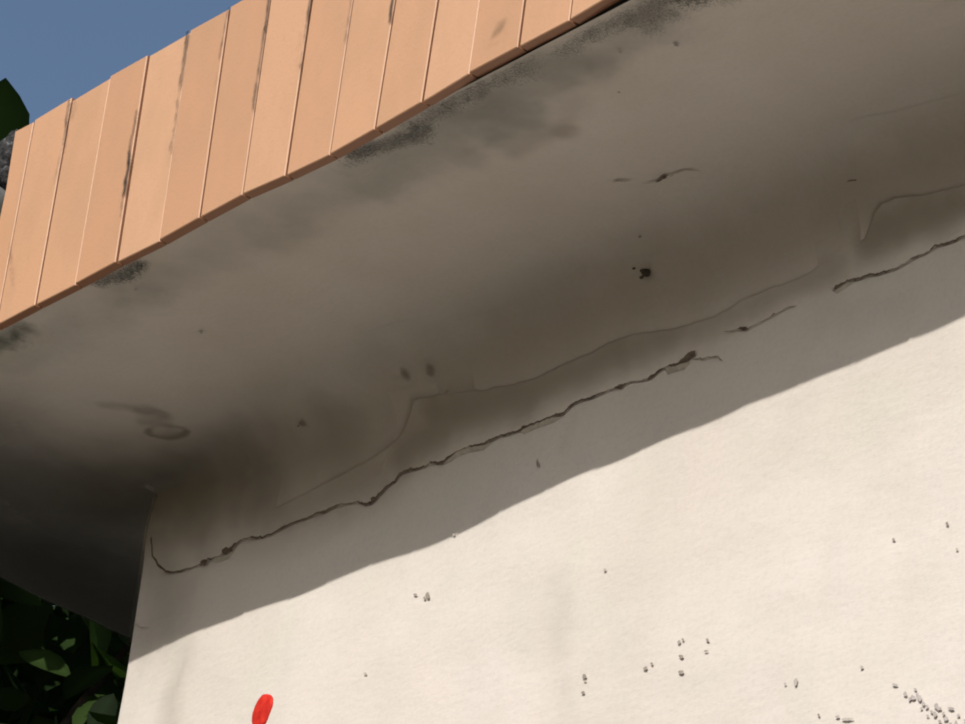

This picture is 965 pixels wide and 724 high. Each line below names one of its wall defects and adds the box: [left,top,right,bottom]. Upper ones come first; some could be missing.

crack [612,170,698,184]
crack [832,235,965,294]
crack [726,306,795,332]
crack [150,350,721,573]
leakage [0,469,143,639]